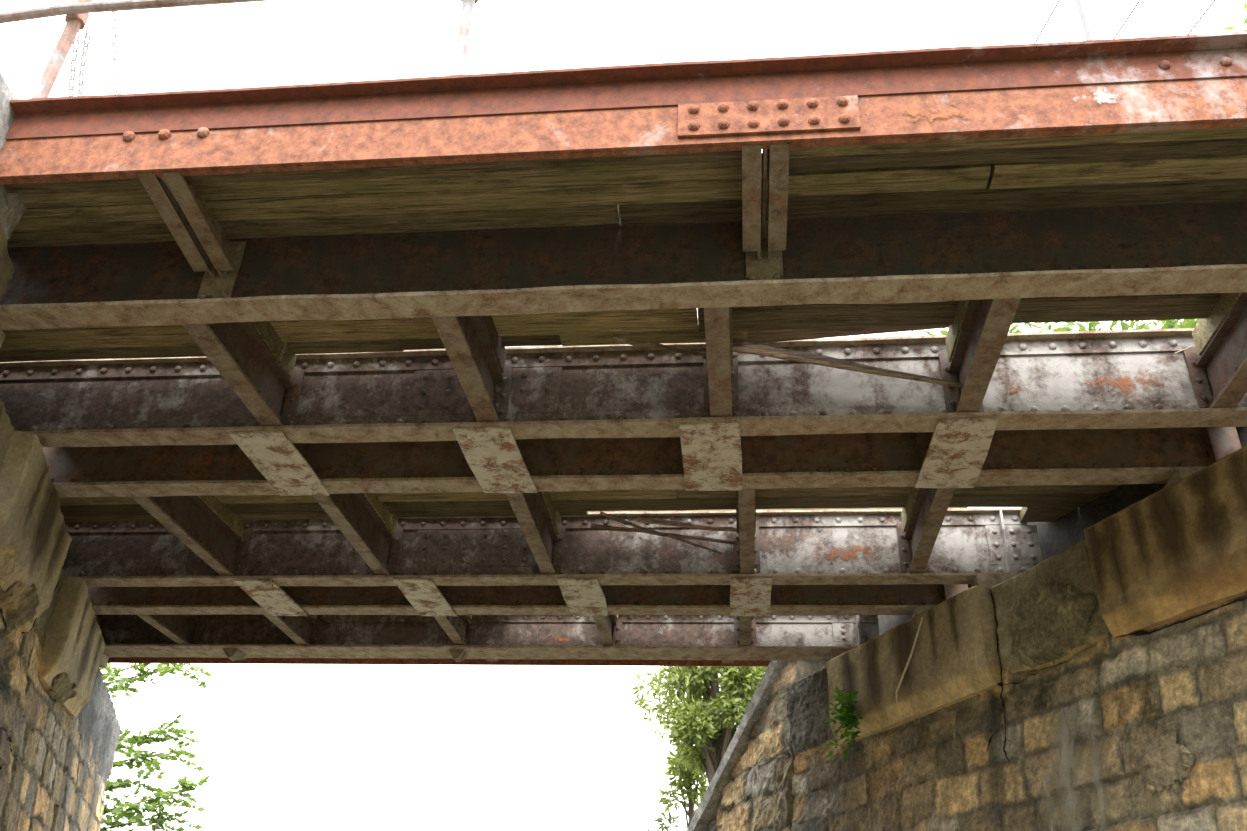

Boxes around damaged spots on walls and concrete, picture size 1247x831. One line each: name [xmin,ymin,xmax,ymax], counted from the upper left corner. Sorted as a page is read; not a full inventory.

corrosion [1086,370,1162,397]
corrosion [811,545,872,560]
crack [1115,592,1247,638]